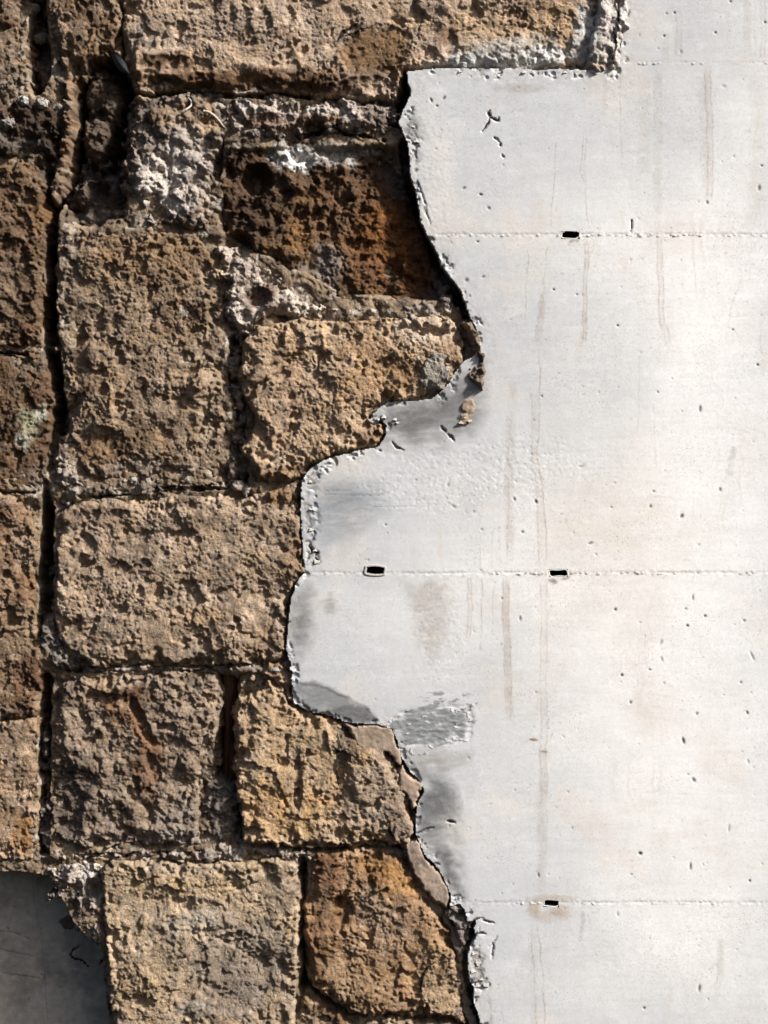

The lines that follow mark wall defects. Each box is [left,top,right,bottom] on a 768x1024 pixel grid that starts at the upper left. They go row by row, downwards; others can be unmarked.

spalling [346,30,404,82]
spalling [404,122,421,162]
peeling [458,398,476,425]
spalling [86,433,149,465]
spalling [304,502,320,565]
water stain [296,682,377,724]
peeling [339,692,476,809]
water stain [423,781,453,876]
peeling [59,915,75,930]
peeling [406,832,490,1024]